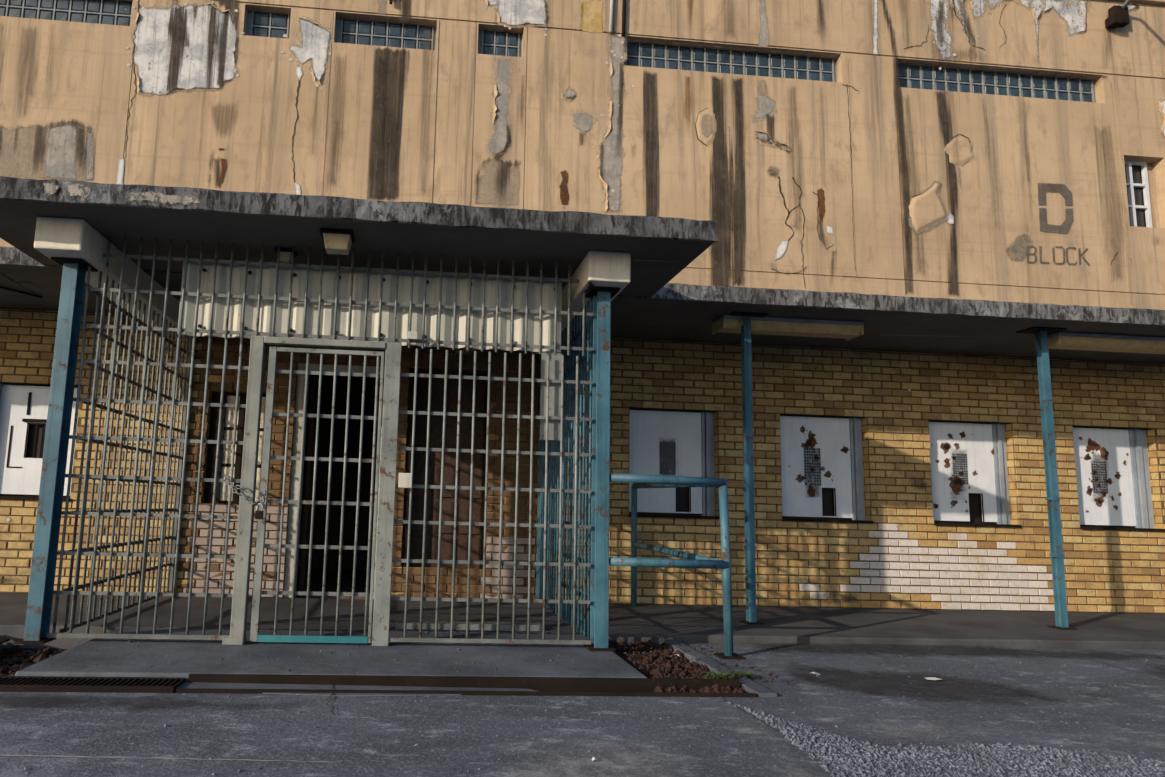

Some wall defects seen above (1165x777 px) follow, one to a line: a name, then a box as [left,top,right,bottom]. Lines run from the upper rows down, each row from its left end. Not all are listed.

crack [116,0,140,185]
peeling [125,2,248,96]
crack [292,64,303,195]
damp [368,47,409,200]
peeling [485,0,551,36]
corrosion [559,170,569,205]
peeling [561,1,635,213]
damp [710,77,746,286]
crack [772,176,807,285]
corrosion [812,189,834,249]
peeling [927,0,1088,70]
corrosion [932,431,978,512]